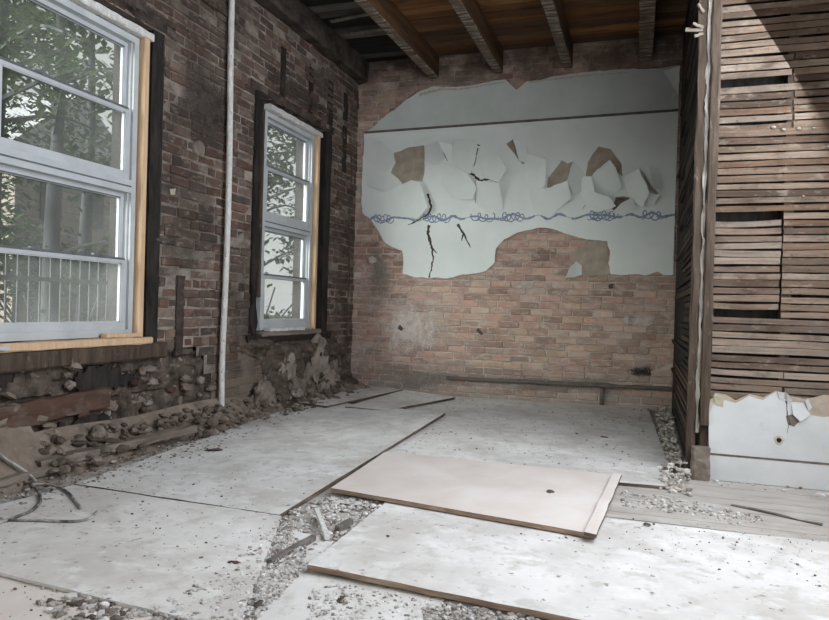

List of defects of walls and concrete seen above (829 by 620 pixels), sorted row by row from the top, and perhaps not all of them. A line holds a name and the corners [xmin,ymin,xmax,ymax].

peeling [664,66,680,95]
peeling [364,137,507,219]
peeling [513,139,662,215]
crack [408,193,437,278]
crack [457,223,471,248]
peeling [565,242,613,289]
spalling [0,348,216,433]
spalling [709,394,723,412]
spalling [777,391,829,426]